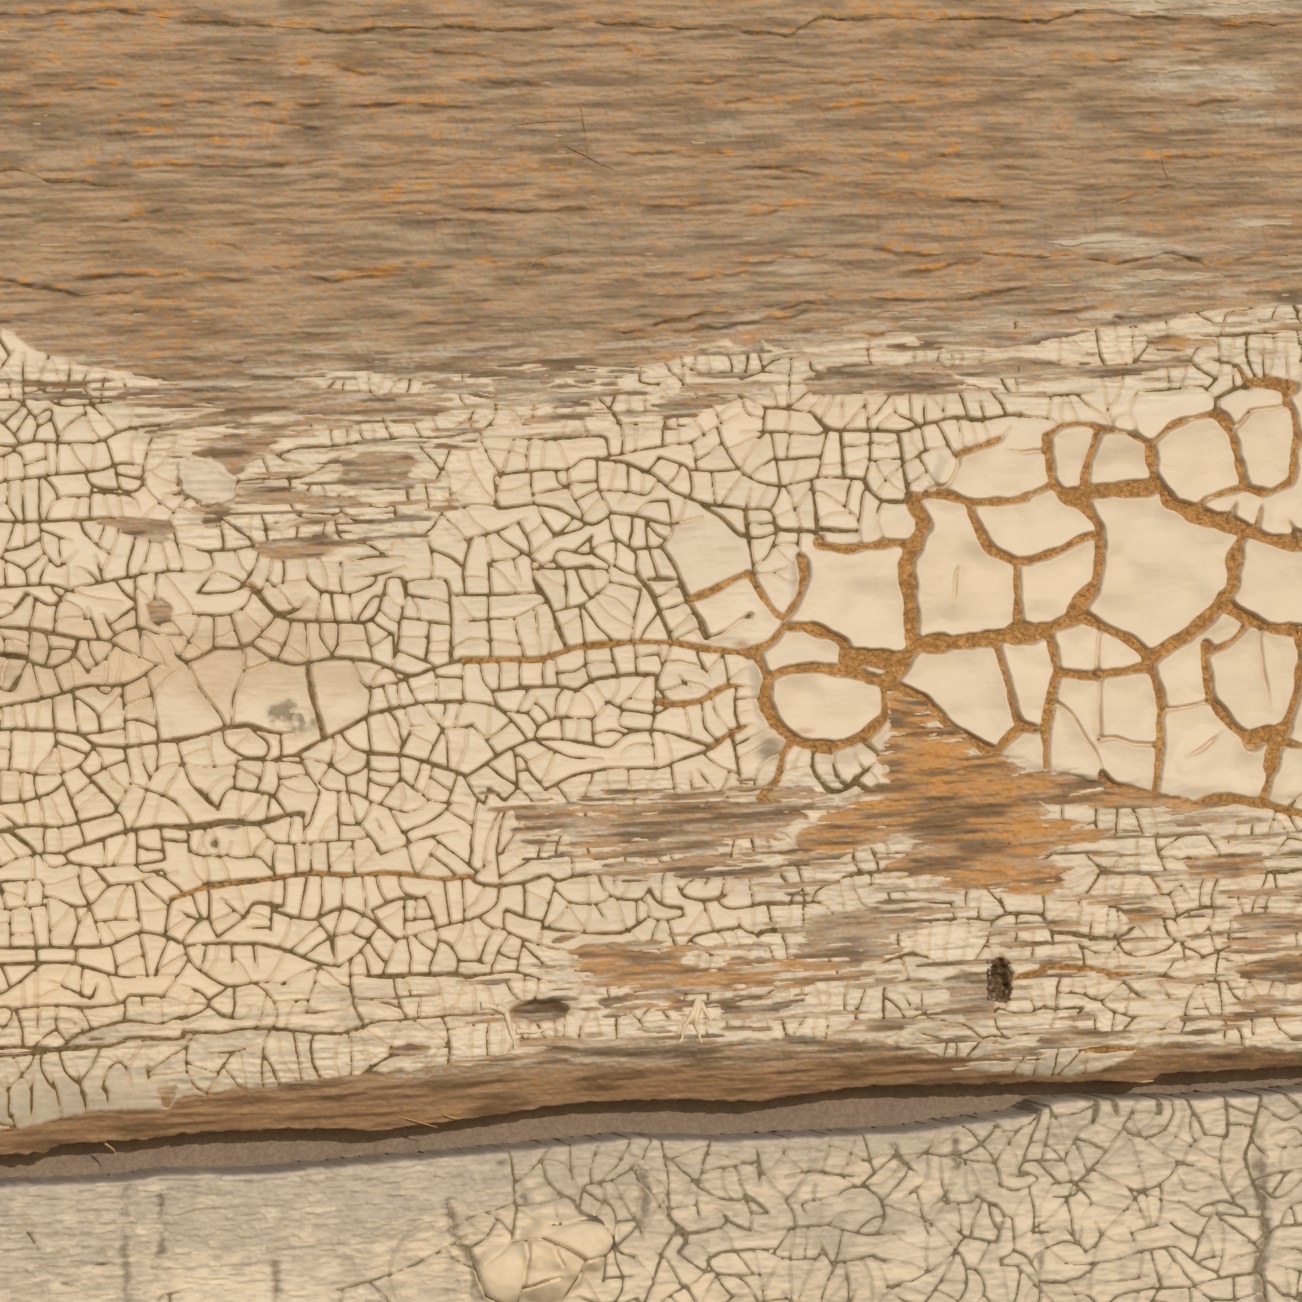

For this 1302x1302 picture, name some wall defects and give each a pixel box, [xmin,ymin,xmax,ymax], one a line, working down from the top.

peeling [0,0,1302,901]
peeling [567,900,935,1024]